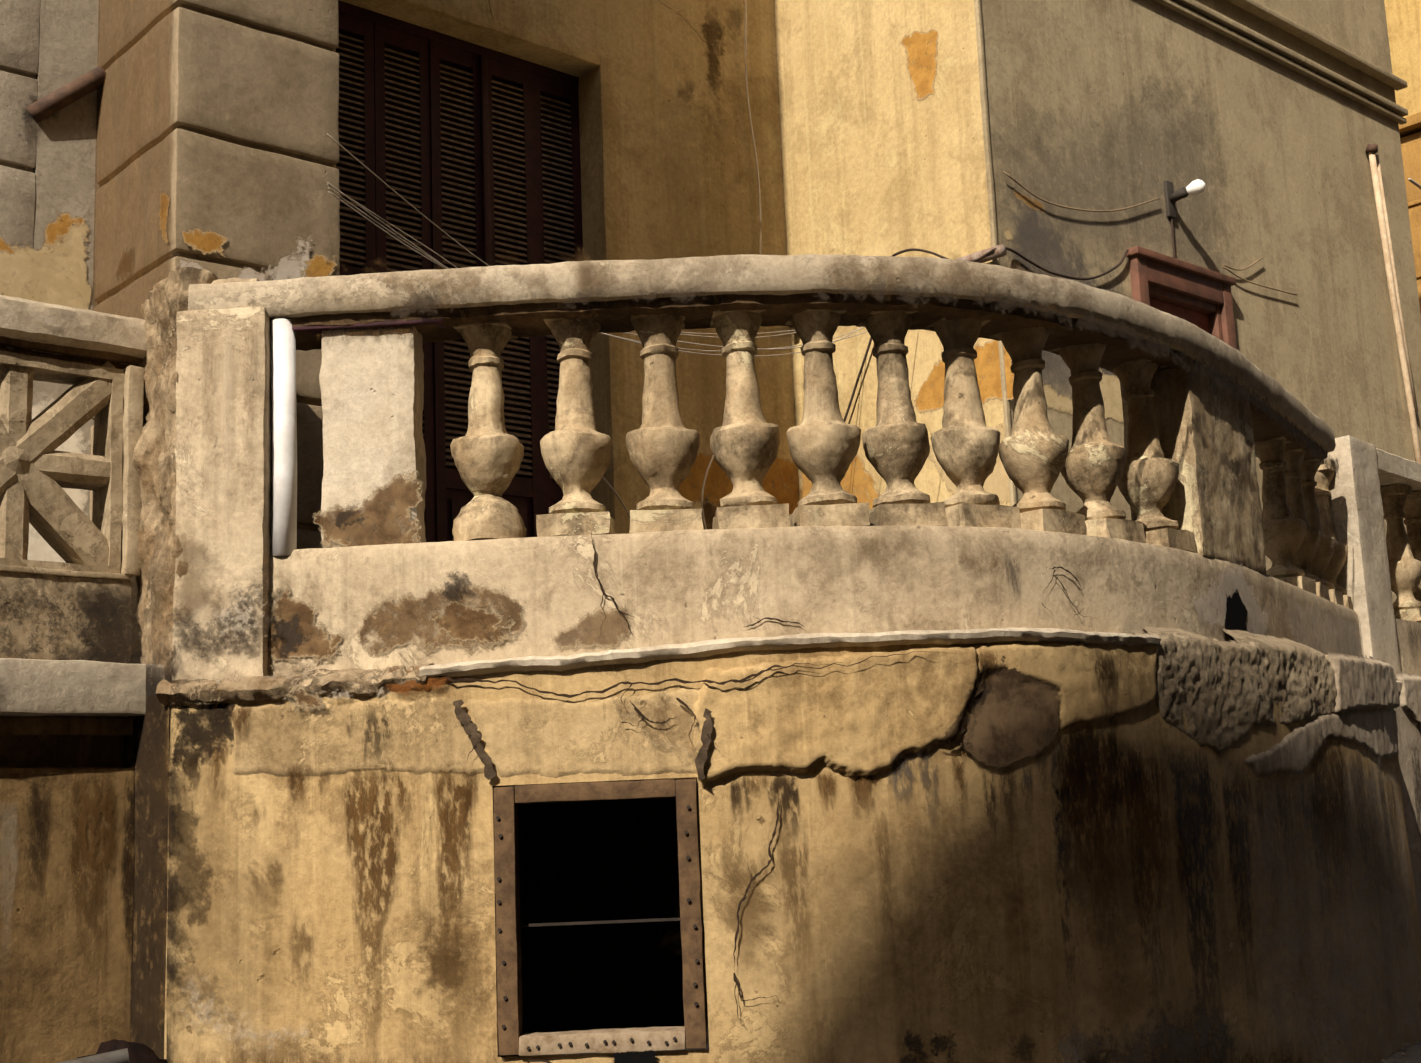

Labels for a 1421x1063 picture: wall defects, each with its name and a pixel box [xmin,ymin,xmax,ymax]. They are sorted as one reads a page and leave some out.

spalling [132,192,337,676]
peeling [679,453,733,530]
peeling [1099,369,1124,423]
crack [551,532,634,650]
crack [745,617,805,628]
crack [436,651,953,780]
spalling [939,666,1061,768]
leakage [0,565,271,1063]
leakage [344,776,409,944]
leakage [436,774,477,921]
crack [733,794,780,1029]
leakage [730,774,798,820]